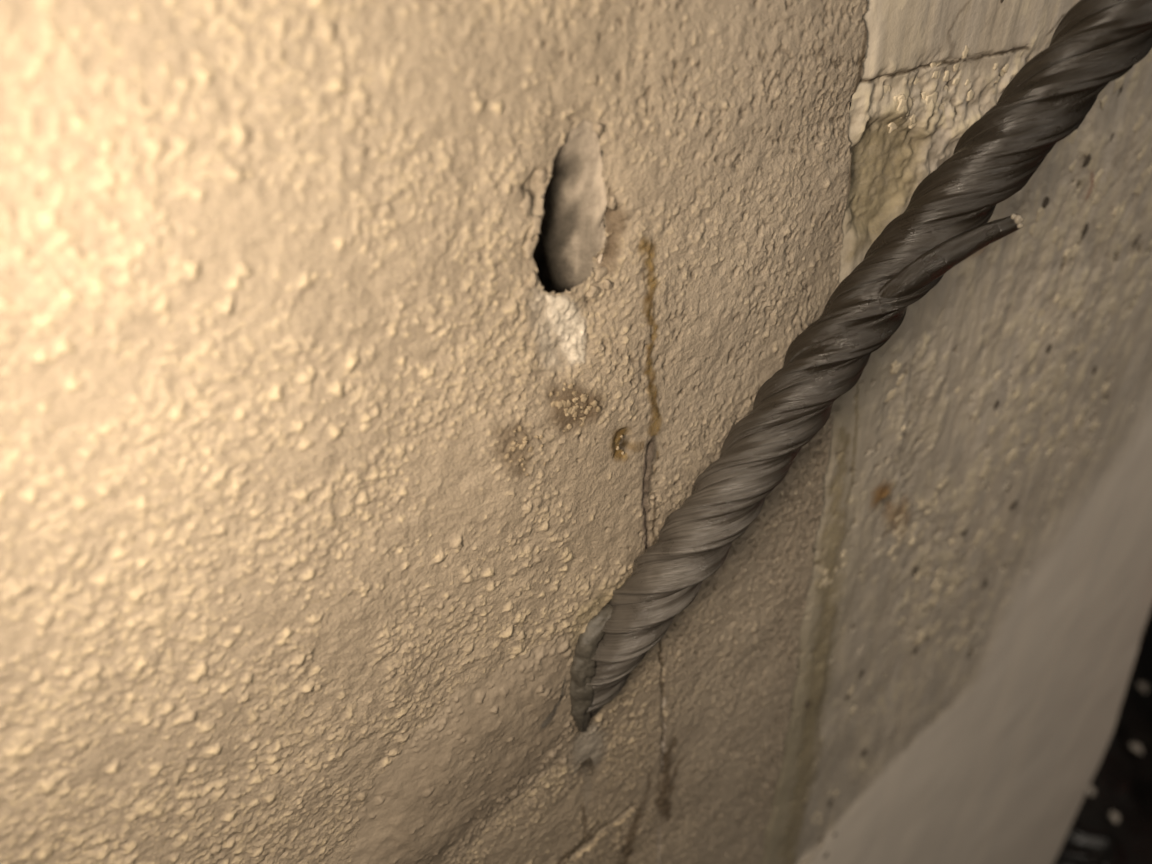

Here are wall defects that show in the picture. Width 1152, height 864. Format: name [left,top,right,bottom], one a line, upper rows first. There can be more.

crack [855,1,1028,91]
spalling [849,45,974,255]
peeling [520,190,542,288]
spalling [586,196,624,298]
corrosion [613,428,627,459]
crack [658,640,666,774]
crack [559,803,635,864]